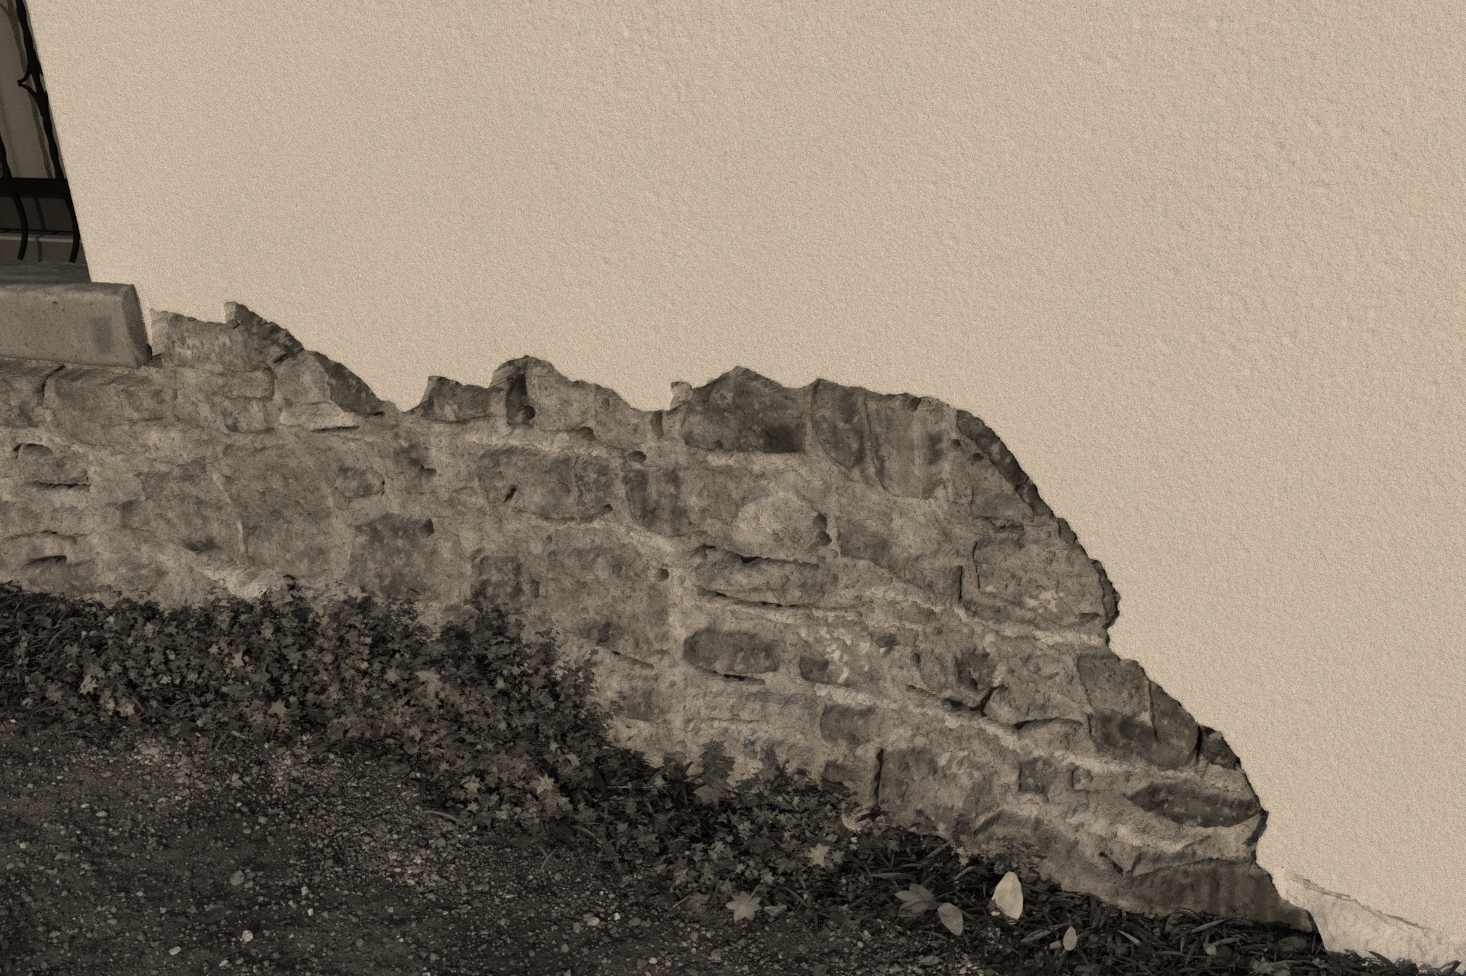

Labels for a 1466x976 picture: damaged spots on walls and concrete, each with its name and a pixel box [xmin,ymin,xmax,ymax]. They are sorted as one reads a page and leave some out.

spalling [0,301,1320,934]